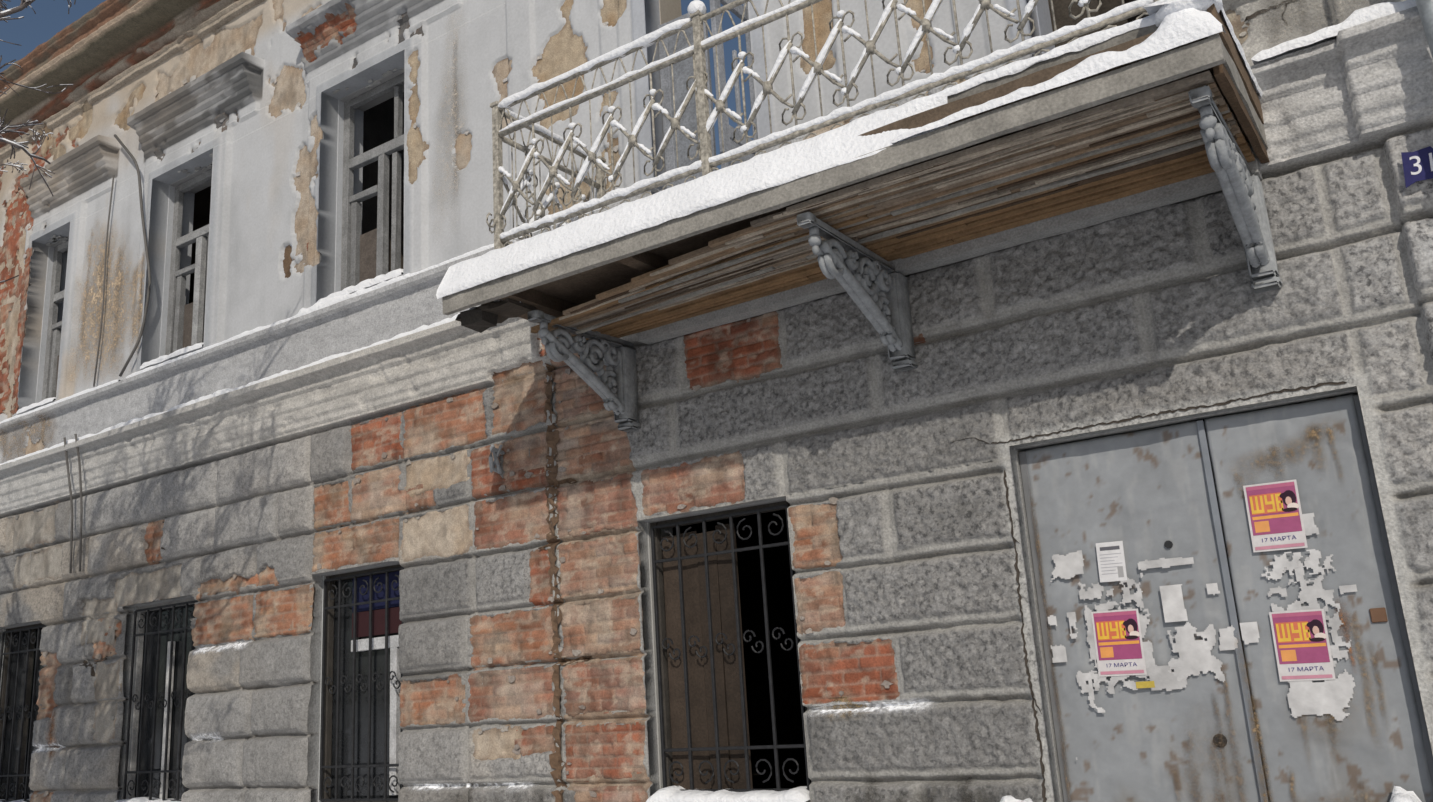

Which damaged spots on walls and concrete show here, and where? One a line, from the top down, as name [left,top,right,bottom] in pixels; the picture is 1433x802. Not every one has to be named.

flaking render [114,0,357,278]
flaking render [333,12,429,184]
flaking render [532,0,588,129]
flaking render [800,0,836,75]
crack [1244,0,1298,26]
spalling [0,100,93,419]
spalling [683,311,782,391]
spalling [80,338,745,802]
crack [538,363,591,802]
spalling [788,497,900,706]
crack [951,381,1347,802]
rust [1339,612,1383,714]